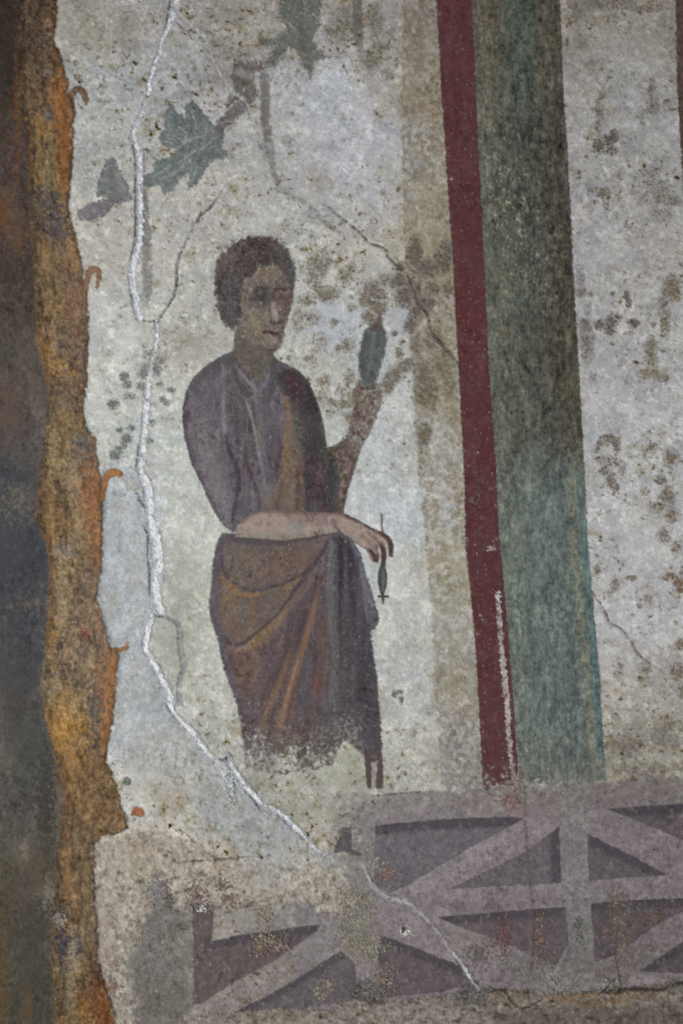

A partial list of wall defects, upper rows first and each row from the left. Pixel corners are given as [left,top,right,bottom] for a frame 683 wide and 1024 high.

crack [319,207,409,278]
crack [422,308,467,375]
crack [125,0,325,856]
peeling [495,591,526,807]
spalling [91,830,683,1024]
crack [365,872,424,936]
crack [444,942,476,987]